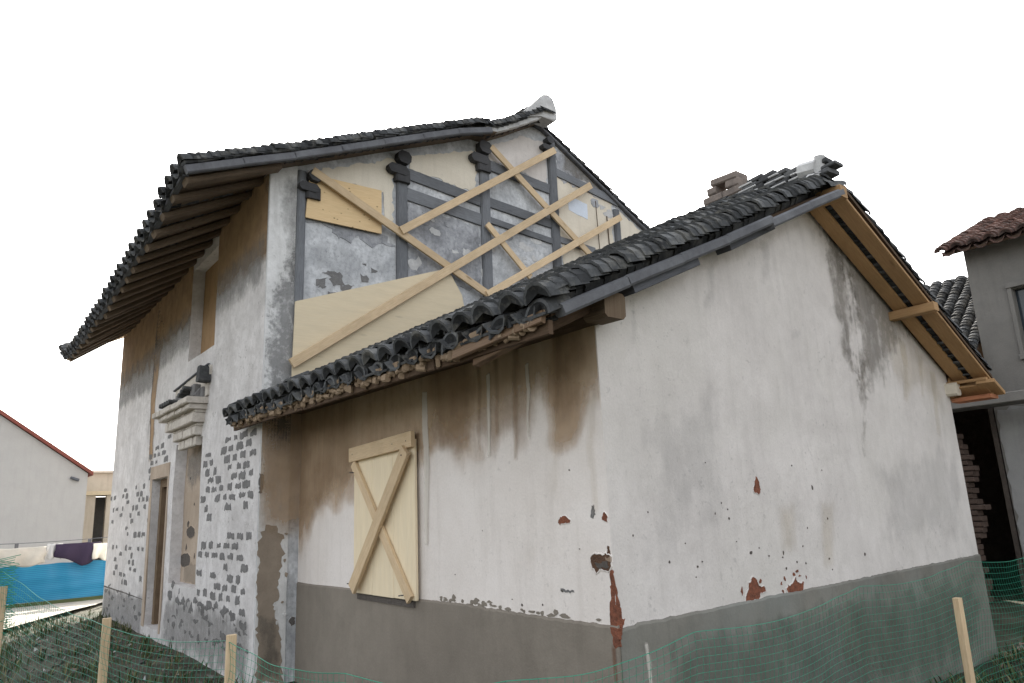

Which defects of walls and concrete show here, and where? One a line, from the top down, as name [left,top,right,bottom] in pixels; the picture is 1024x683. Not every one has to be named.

flaking render [305,218,422,271]
flaking render [316,263,378,294]
leakage [262,325,598,544]
flaking render [194,428,263,522]
spalling [752,475,761,495]
flaking render [104,435,171,621]
spalling [558,515,572,526]
flaking render [167,525,295,683]
flaking render [440,594,570,619]
spalling [579,546,625,649]
spalling [741,575,767,601]
spalling [750,547,807,593]